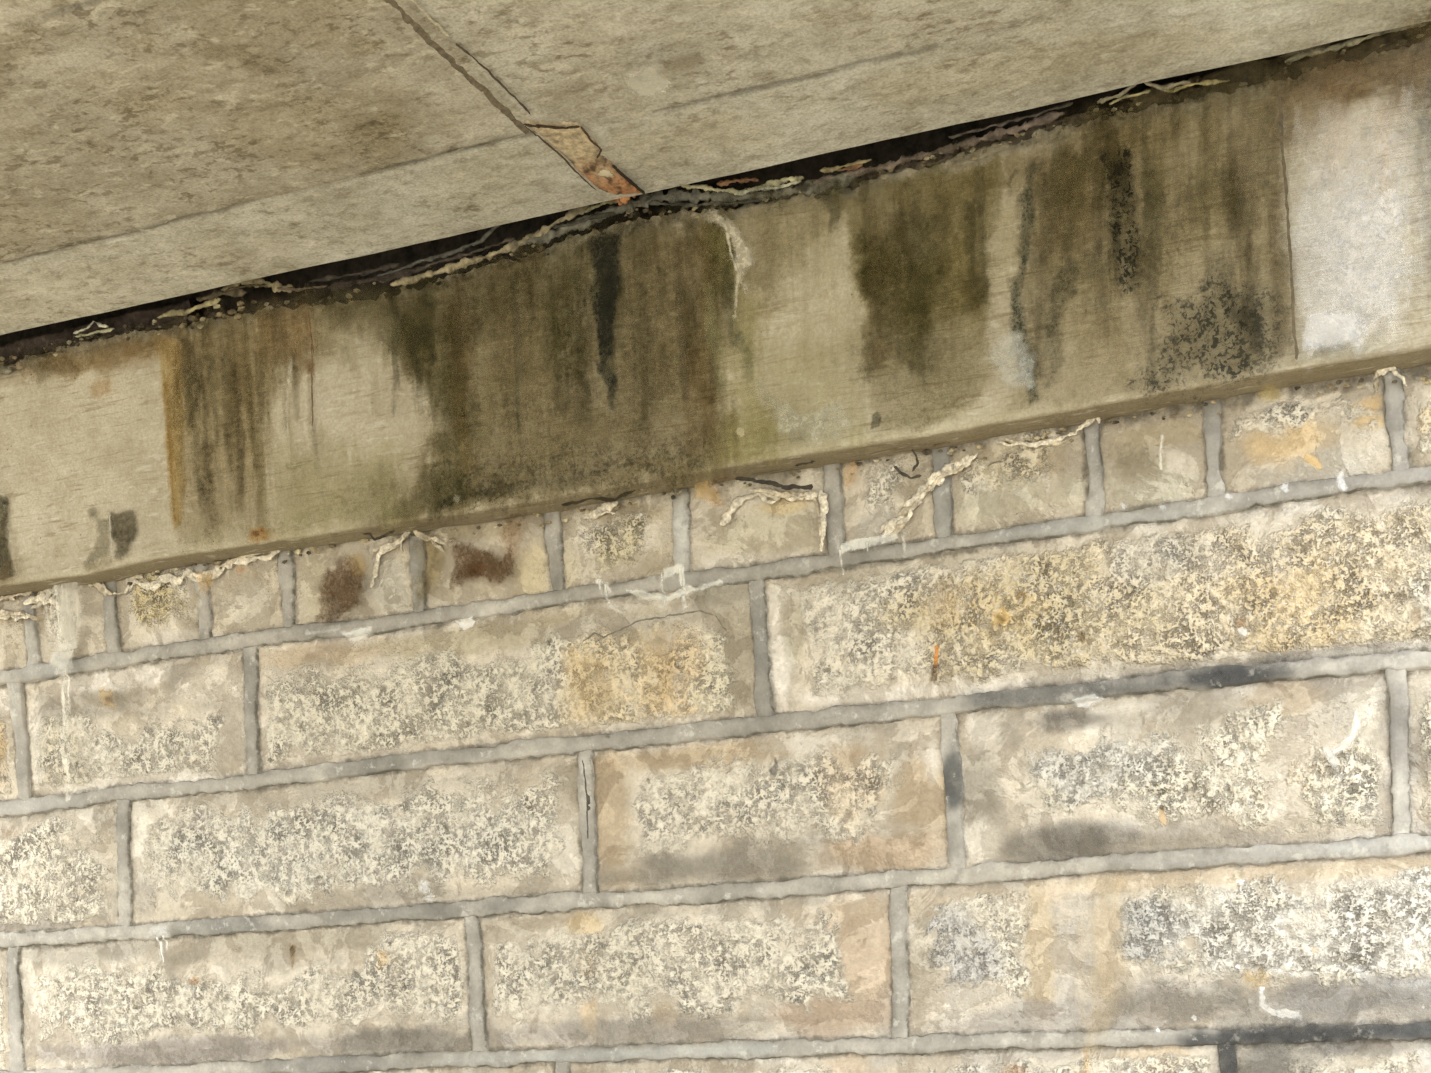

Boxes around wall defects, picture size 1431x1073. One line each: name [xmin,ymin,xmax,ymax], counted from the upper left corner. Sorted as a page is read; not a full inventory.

crack [524,123,645,194]
damp [22,43,1317,525]
rust [159,339,184,528]
damp [0,497,12,580]
damp [84,509,136,571]
efflorescence [839,534,905,575]